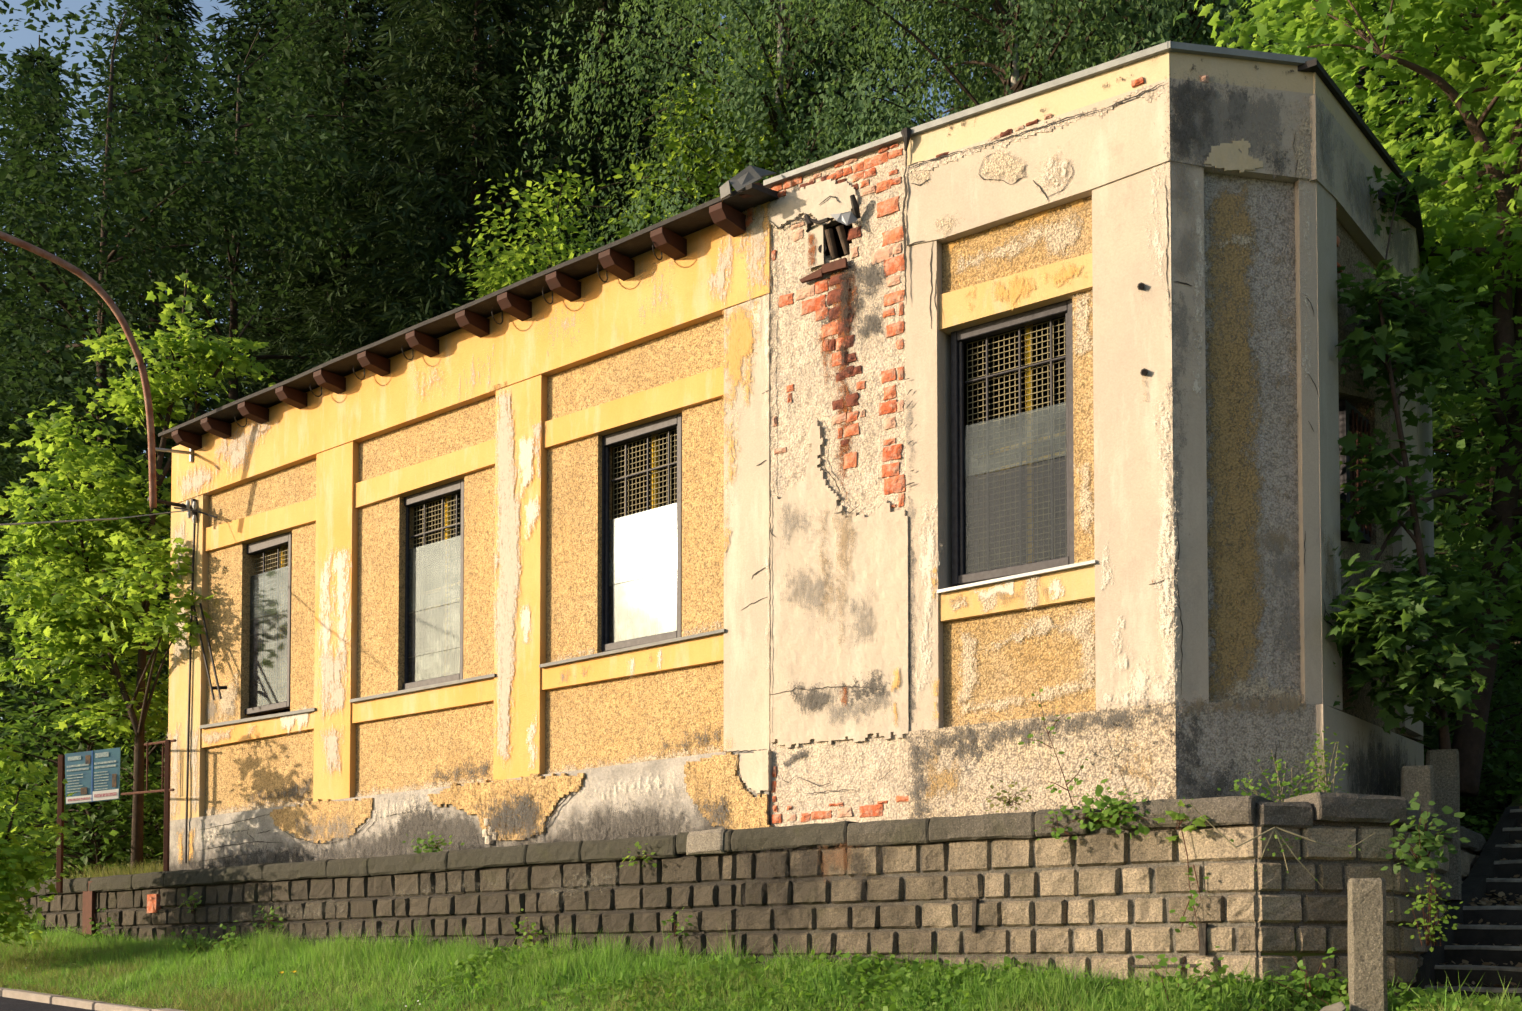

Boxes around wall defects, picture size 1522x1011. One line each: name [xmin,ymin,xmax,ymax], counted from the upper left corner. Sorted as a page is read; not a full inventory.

flaking render [1204,138,1263,173]
peeling [707,77,1166,517]
damp [900,74,1318,819]
flaking render [1074,463,1094,533]
peeling [407,346,541,769]
peeling [280,549,352,775]
damp [788,670,890,724]
flaking render [270,798,374,847]
peeling [684,732,909,829]